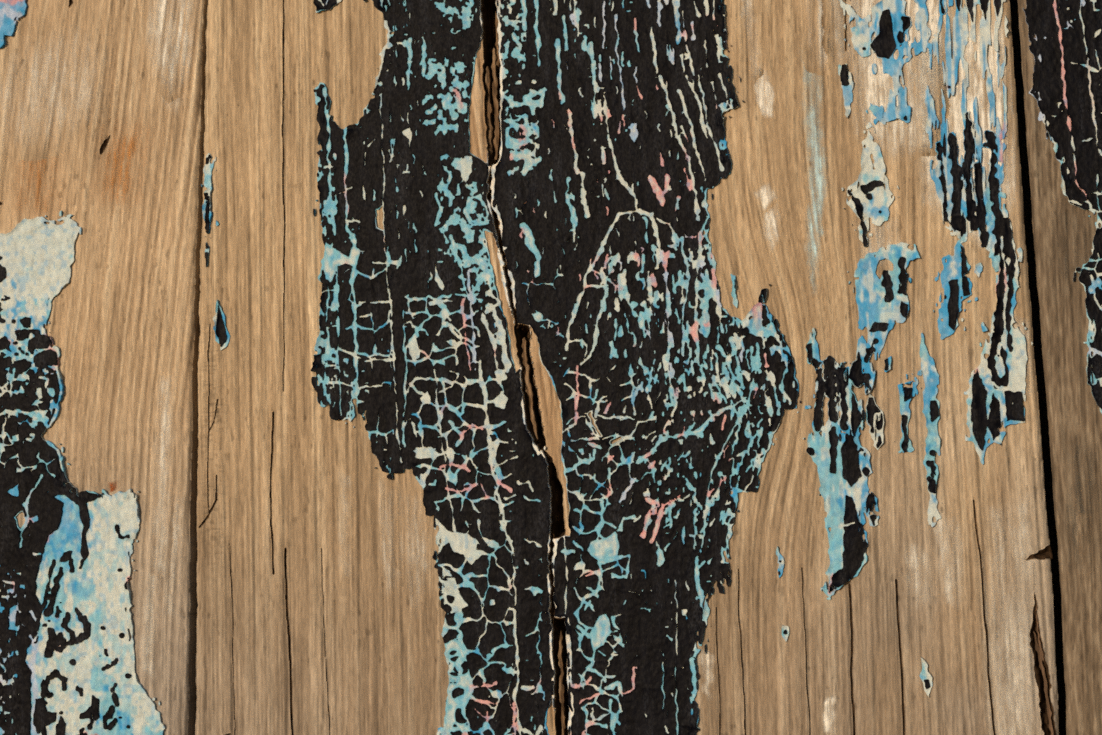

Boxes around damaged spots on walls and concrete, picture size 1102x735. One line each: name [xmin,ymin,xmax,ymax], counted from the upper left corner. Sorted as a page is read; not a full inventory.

peeling [0,0,28,49]
peeling [201,153,219,267]
peeling [1023,0,1102,413]
peeling [213,300,230,350]
crack [469,0,571,735]
peeling [311,0,1033,735]
peeling [0,211,166,735]
spalling [1026,545,1052,560]
crack [1030,594,1056,735]